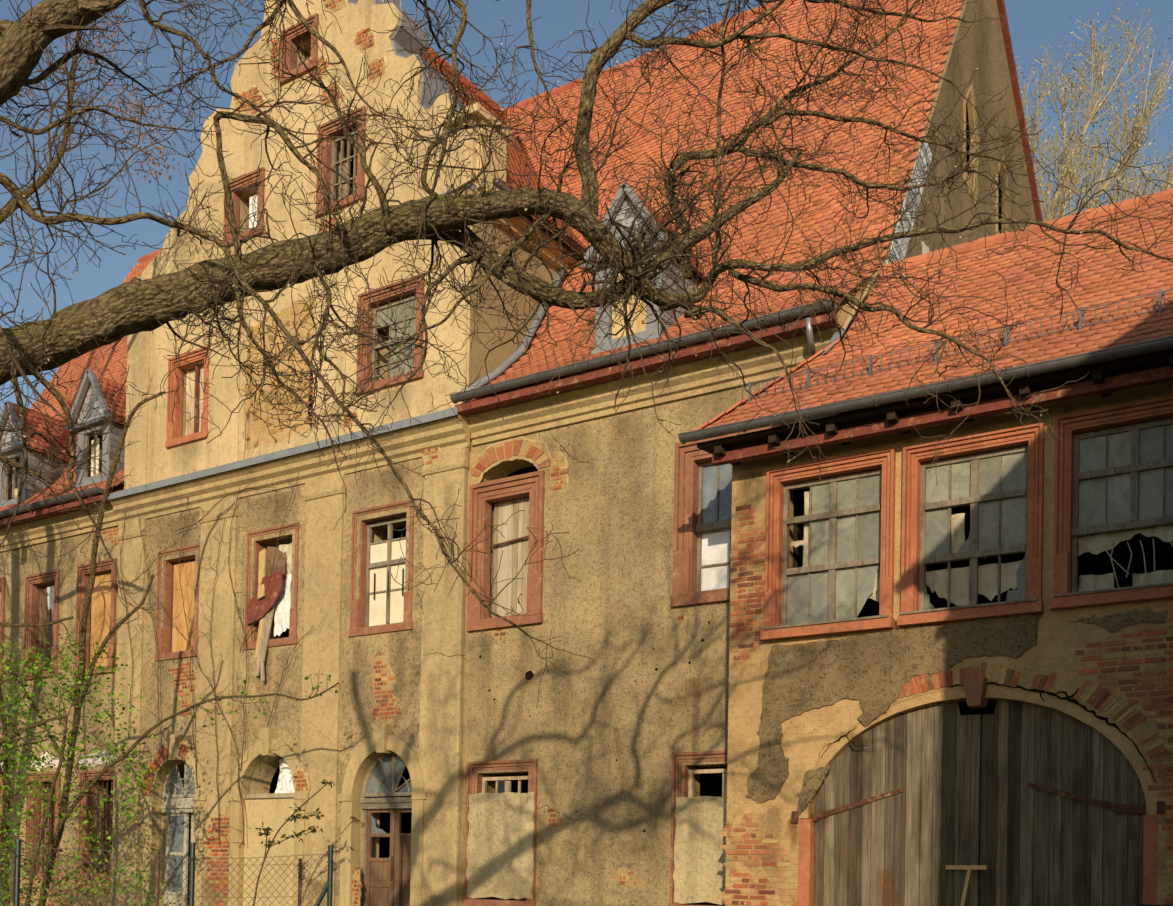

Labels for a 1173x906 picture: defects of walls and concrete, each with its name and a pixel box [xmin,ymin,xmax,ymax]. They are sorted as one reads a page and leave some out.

peeling [1070,609,1168,633]
spalling [168,658,197,718]
spalling [369,650,402,724]
peeling [717,502,1057,906]
crack [946,682,1156,783]
spalling [1074,675,1173,779]
spalling [203,805,242,906]